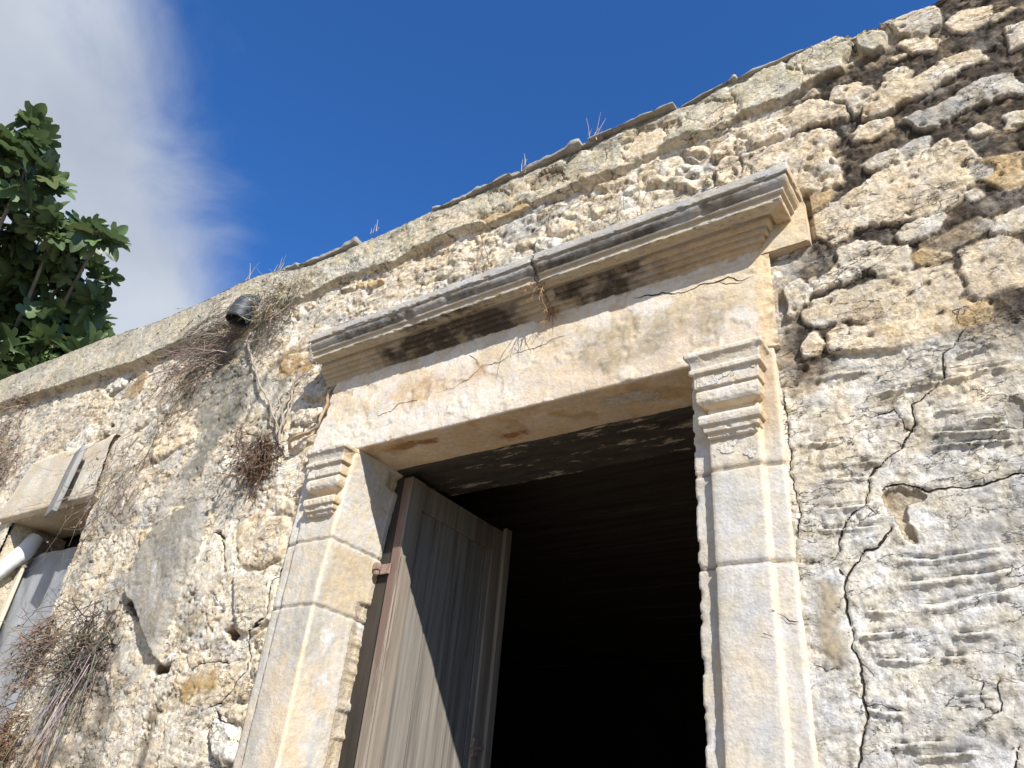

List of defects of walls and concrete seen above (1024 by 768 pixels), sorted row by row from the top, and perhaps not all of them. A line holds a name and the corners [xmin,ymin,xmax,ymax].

water stain [609,223,659,248]
water stain [532,257,581,276]
water stain [554,260,639,305]
crack [638,276,751,298]
water stain [342,307,517,362]
water stain [580,312,673,367]
spalling [881,487,927,544]
crack [782,328,1024,768]